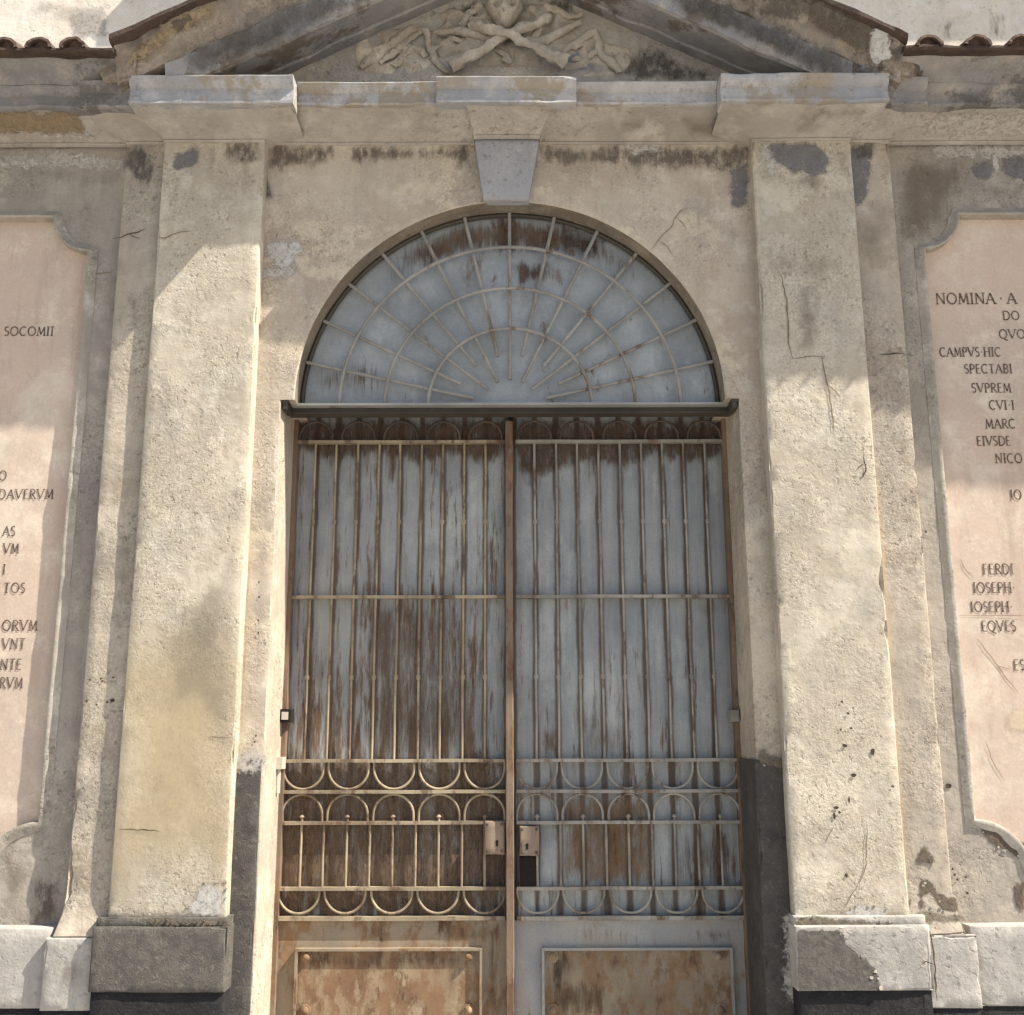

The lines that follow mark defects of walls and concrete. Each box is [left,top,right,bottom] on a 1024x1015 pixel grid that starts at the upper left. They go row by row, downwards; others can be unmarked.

damp [124,148,153,182]
damp [353,146,466,163]
damp [546,141,783,177]
crack [650,207,688,256]
crack [780,274,840,433]
spalling [144,881,228,927]
corrosion [554,953,602,1013]